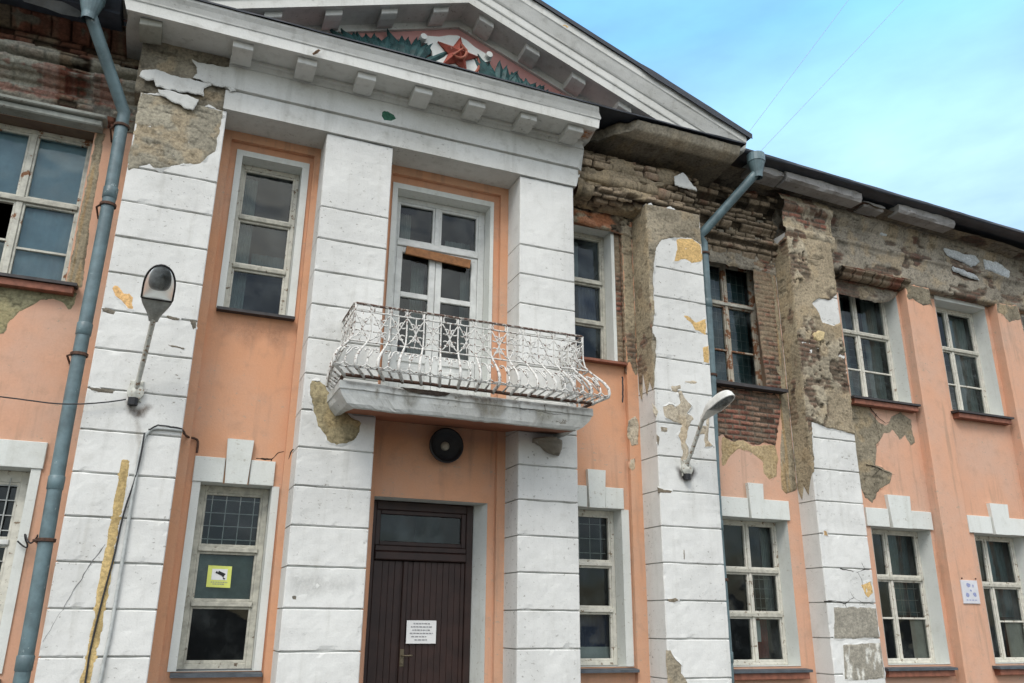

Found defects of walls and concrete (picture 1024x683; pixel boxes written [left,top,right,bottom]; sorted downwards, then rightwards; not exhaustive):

spalling [128,92,226,173]
spalling [0,133,105,335]
peeling [112,286,135,313]
peeling [943,248,1010,280]
spalling [573,203,934,503]
spalling [308,378,361,447]
peeling [79,459,129,683]